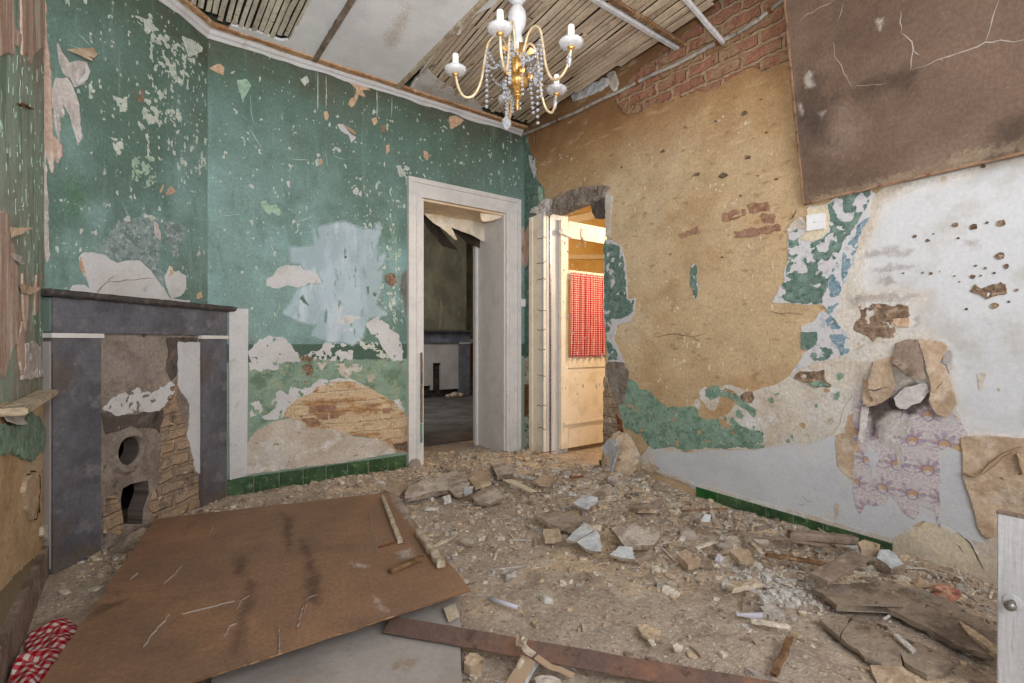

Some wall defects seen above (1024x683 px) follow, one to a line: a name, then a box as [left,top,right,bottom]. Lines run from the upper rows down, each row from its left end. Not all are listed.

flaking render [616,0,789,115]
crack [799,0,882,87]
crack [899,1,1022,71]
peeling [0,0,314,381]
flaking render [248,82,557,453]
peeling [558,151,785,555]
peeling [719,190,957,479]
hole [952,219,1006,239]
flaking render [954,252,1018,309]
flaking render [149,383,200,523]
flaking render [102,495,123,535]